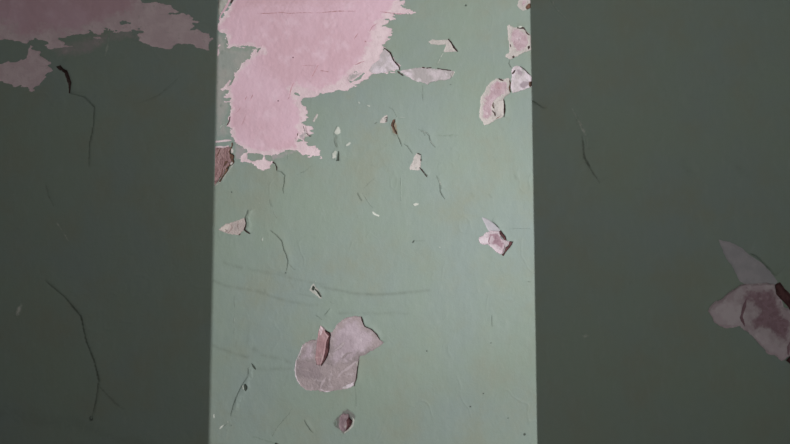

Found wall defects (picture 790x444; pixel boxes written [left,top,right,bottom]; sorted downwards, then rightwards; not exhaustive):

peeling [0,0,458,186]
peeling [479,25,532,125]
peeling [219,209,255,235]
peeling [479,217,513,256]
peeling [708,240,790,363]
peeling [294,316,385,434]